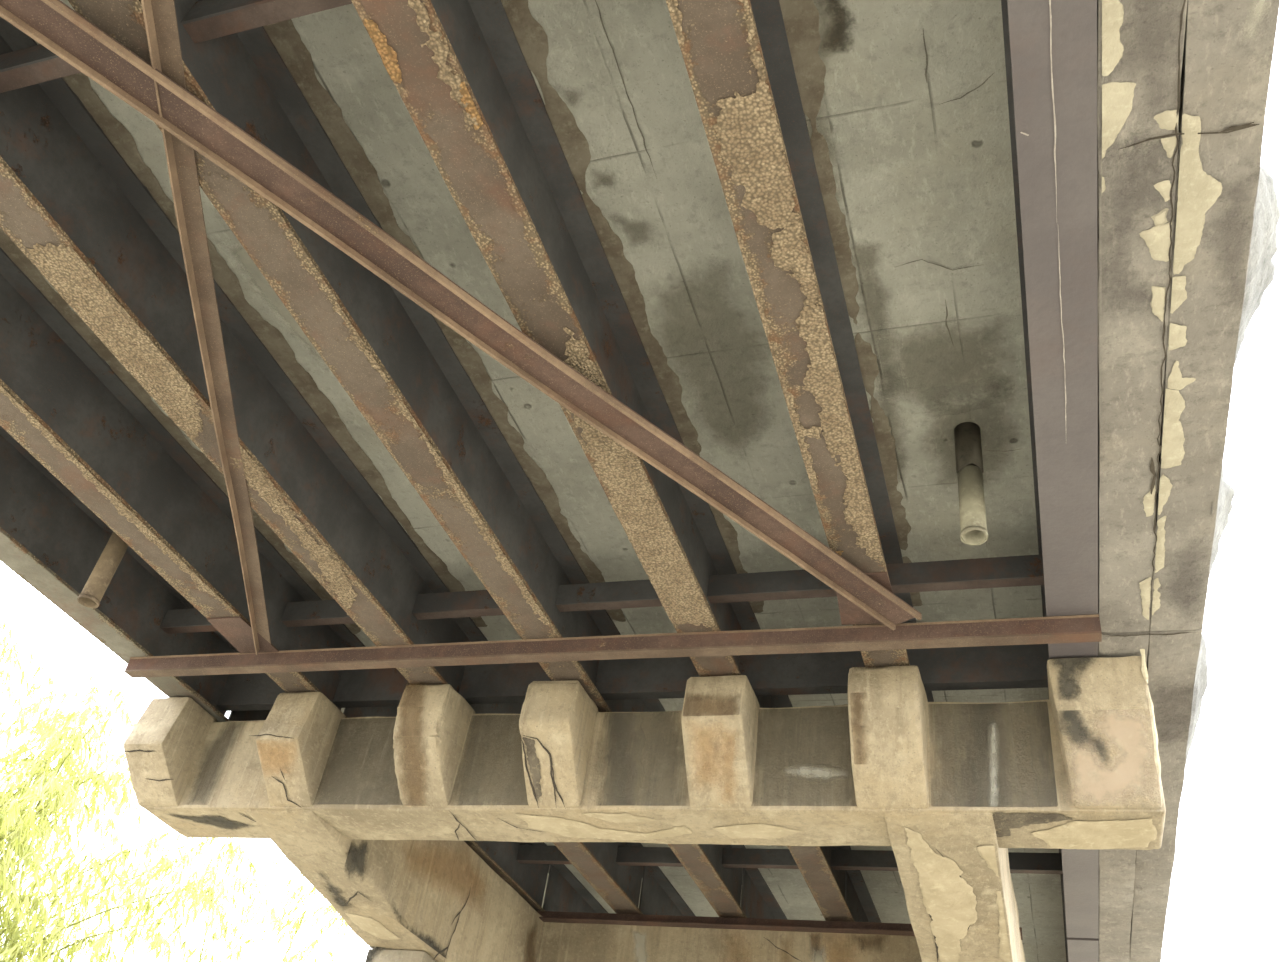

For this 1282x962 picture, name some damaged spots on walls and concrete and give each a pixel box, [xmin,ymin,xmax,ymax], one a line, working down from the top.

leakage [824,0,851,51]
peeling [1102,0,1136,159]
rust [26,243,204,438]
rust [711,0,884,561]
peeling [1139,110,1222,620]
crack [1115,0,1259,637]
rust [0,385,220,599]
leakage [933,658,1107,807]
leakage [345,843,368,879]
crack [433,883,472,962]
peeling [904,827,978,962]
peeling [977,812,1157,962]